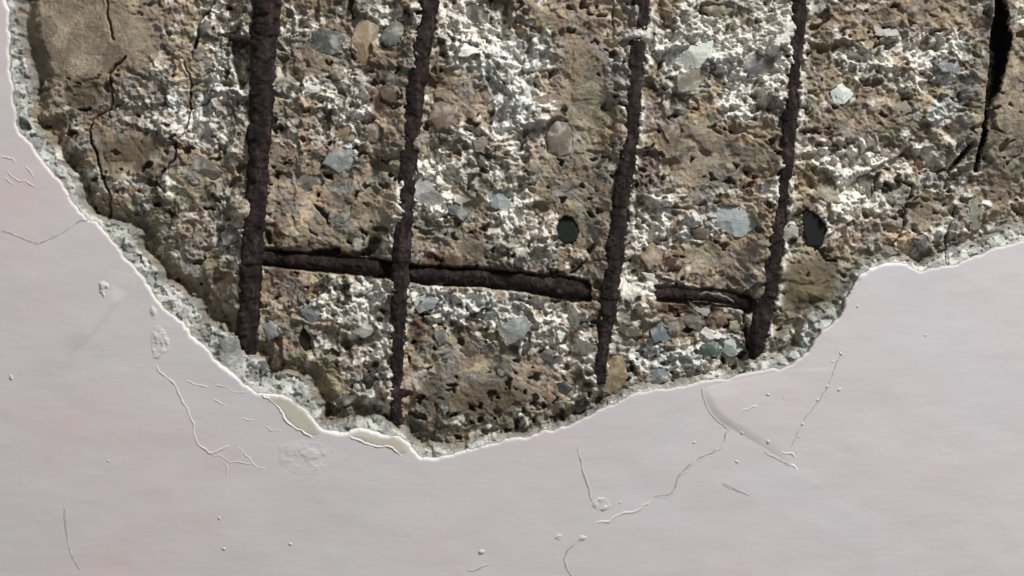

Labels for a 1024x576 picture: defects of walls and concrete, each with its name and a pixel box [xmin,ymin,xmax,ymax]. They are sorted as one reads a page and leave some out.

crack [948,0,1013,173]
crack [1,58,126,245]
corrosion [636,147,663,196]
corrosion [300,243,357,257]
corrosion [409,255,475,271]
spalling [0,0,1024,460]
corrosion [492,265,533,277]
corrosion [410,312,431,342]
corrosion [657,291,734,327]
crack [764,353,845,466]
crack [654,388,729,498]
crack [575,448,593,501]